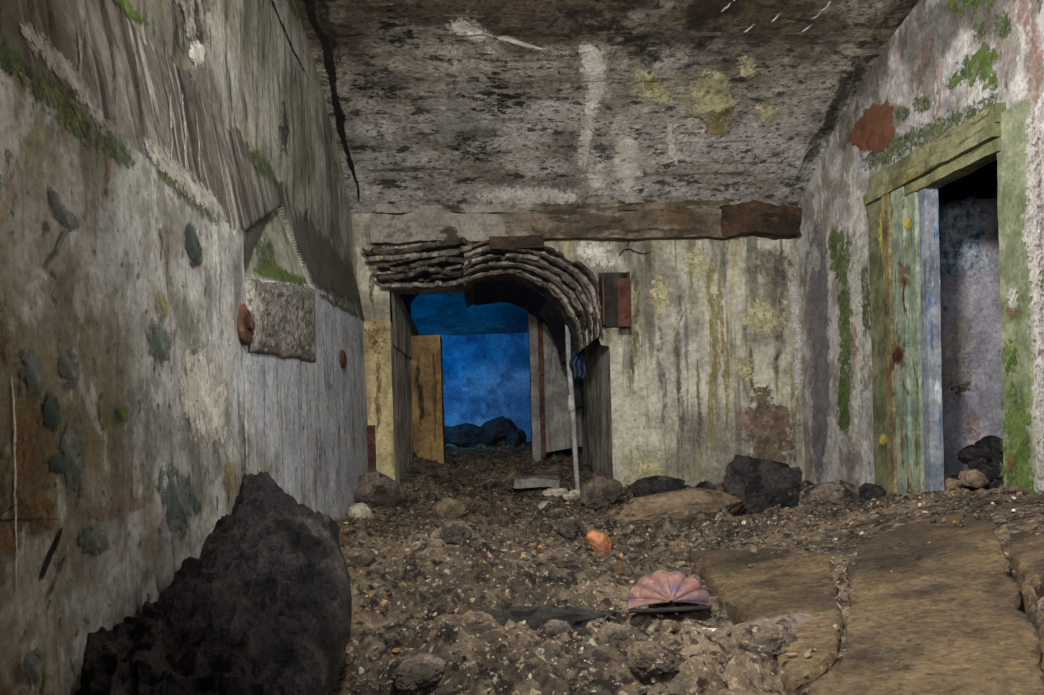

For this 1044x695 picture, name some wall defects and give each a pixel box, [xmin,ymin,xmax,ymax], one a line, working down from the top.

leakage [20,0,108,132]
crack [263,0,360,201]
leakage [475,0,663,205]
leakage [664,122,679,165]
leakage [677,0,759,49]
leakage [649,275,672,320]
leakage [683,245,729,450]
leakage [740,226,831,481]
leakage [628,446,673,483]